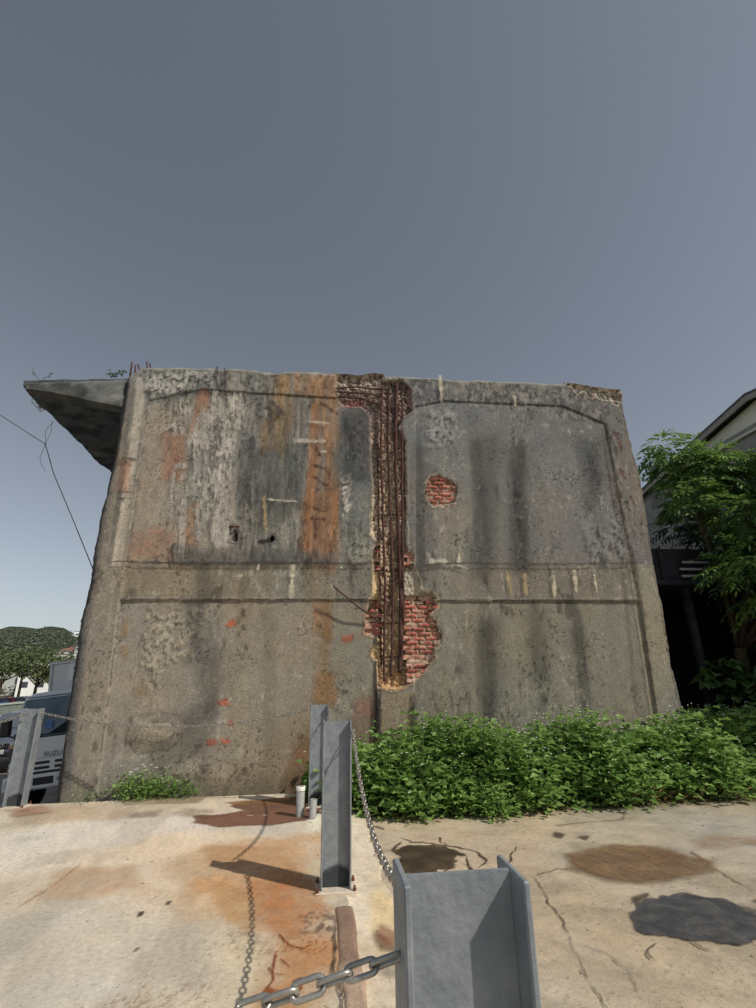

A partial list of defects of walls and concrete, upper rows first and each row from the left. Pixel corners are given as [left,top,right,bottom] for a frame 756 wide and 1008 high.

rust [305,377,338,539]
flaking render [427,409,455,446]
flaking render [423,473,460,510]
spalling [332,373,444,693]
leakage [391,837,487,874]
leakage [568,844,712,882]
crack [331,927,344,1008]
crack [509,846,638,1008]